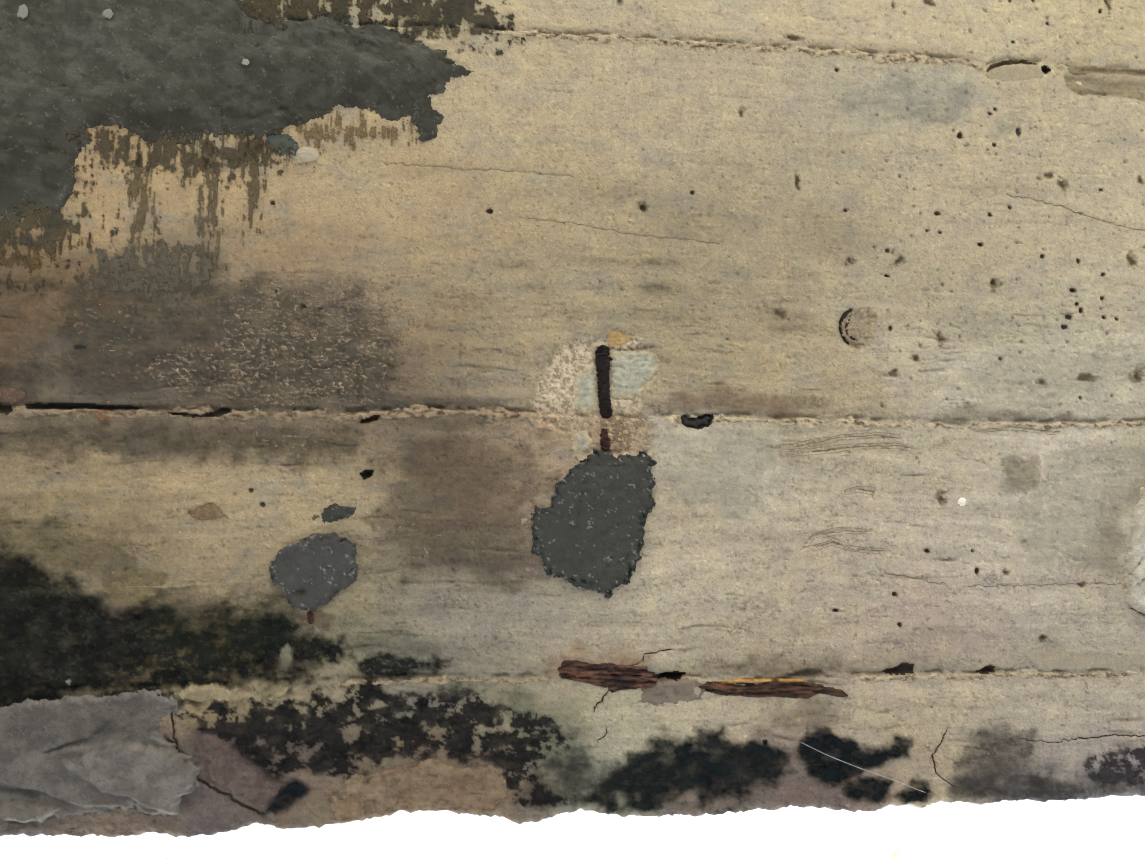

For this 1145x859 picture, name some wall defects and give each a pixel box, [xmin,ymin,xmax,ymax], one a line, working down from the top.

spalling [523,328,663,460]
peeling [103,566,167,607]
peeling [176,682,290,702]
peeling [280,644,292,668]
leakage [0,546,931,814]
peeling [191,731,281,812]
leakage [951,730,1145,802]